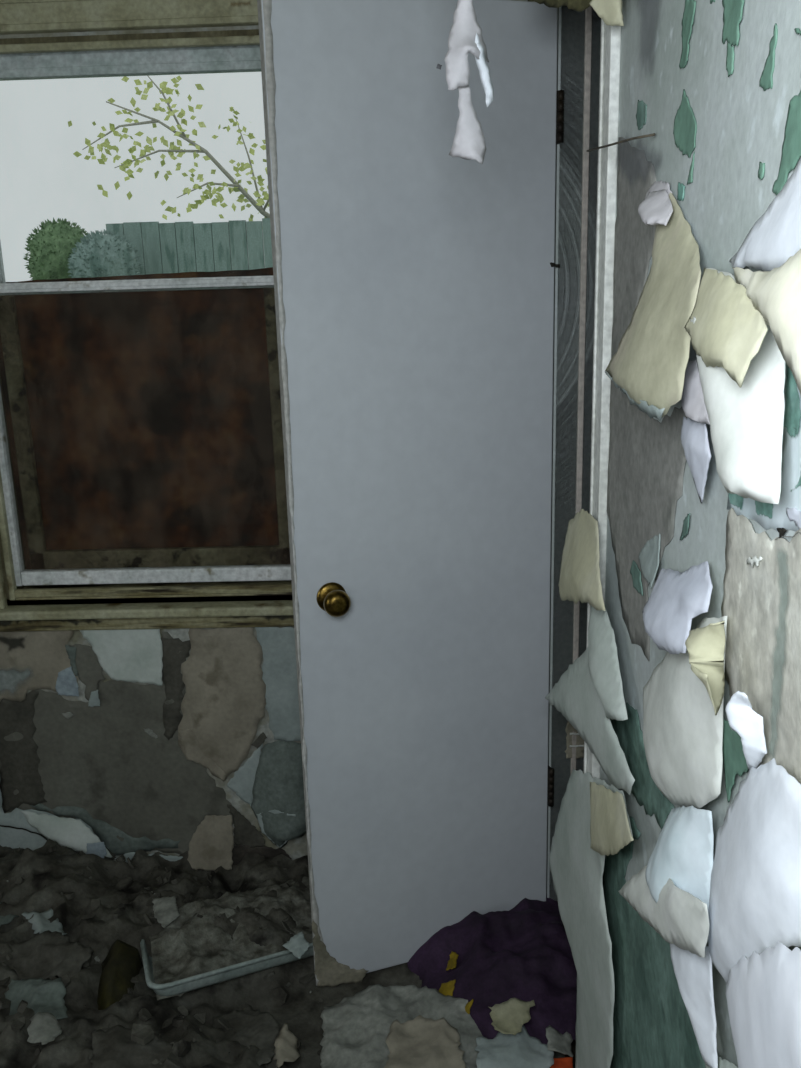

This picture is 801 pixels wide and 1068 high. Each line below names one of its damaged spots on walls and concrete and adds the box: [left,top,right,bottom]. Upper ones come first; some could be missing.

flaking render [611,89,697,359]
peeling [679,0,696,69]
peeling [710,0,744,77]
peeling [759,23,778,91]
peeling [758,90,801,196]
flaking render [607,380,690,661]
flaking render [721,363,801,803]
flaking render [0,626,301,866]
flaking render [565,721,584,759]
peeling [603,702,705,1068]